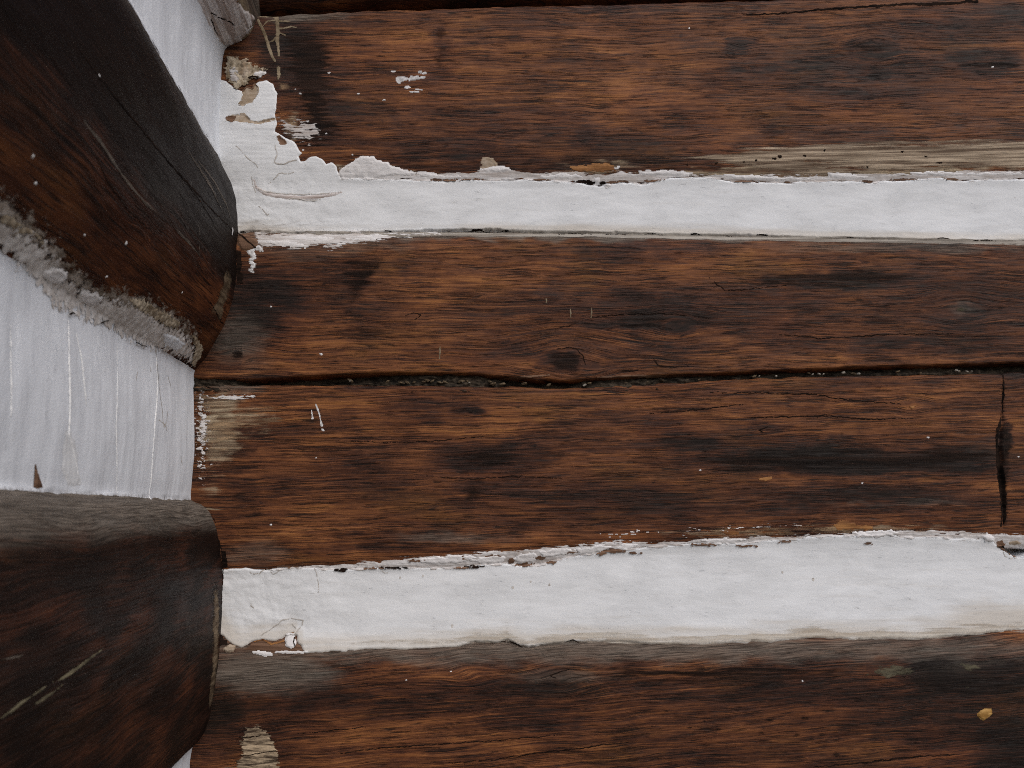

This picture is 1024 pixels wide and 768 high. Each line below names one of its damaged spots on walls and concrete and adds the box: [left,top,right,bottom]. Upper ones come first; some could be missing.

peeling [198,0,303,145]
peeling [237,228,451,252]